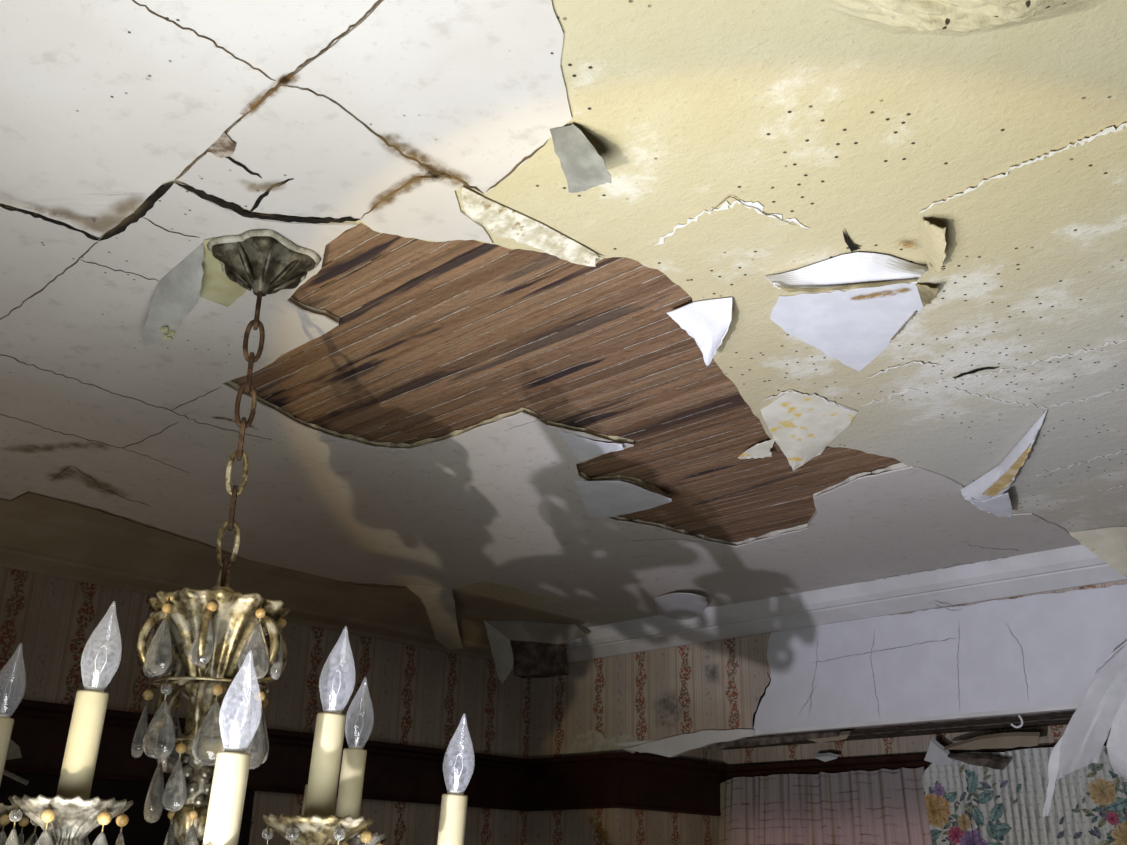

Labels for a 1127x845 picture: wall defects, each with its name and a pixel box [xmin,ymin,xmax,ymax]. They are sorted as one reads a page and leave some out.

crack [0,0,548,320]
peeling [550,124,611,193]
crack [919,123,1127,213]
peeling [460,186,604,267]
crack [843,231,861,252]
crack [0,355,271,472]
peeling [667,297,733,366]
peeling [738,391,858,471]
peeling [765,218,947,372]
crack [763,340,1126,411]
crack [2,466,239,558]
flaking render [752,527,1127,731]